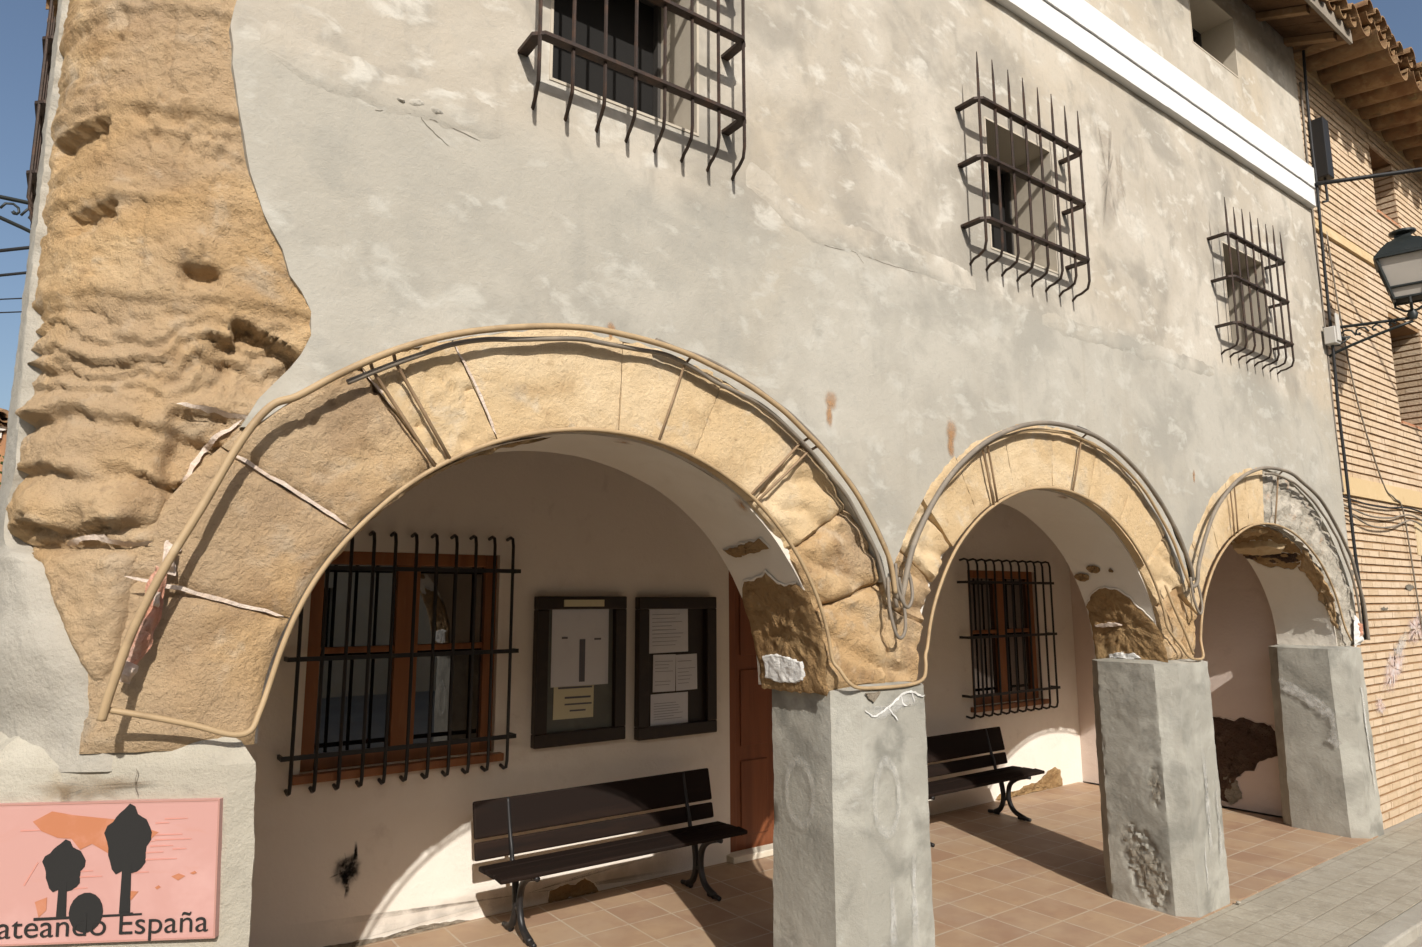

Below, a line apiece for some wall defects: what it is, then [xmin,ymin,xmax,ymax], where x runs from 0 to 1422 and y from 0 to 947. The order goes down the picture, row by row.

crack [377,110,478,146]
peeling [722,537,770,558]
peeling [741,569,829,696]
peeling [1074,565,1168,663]